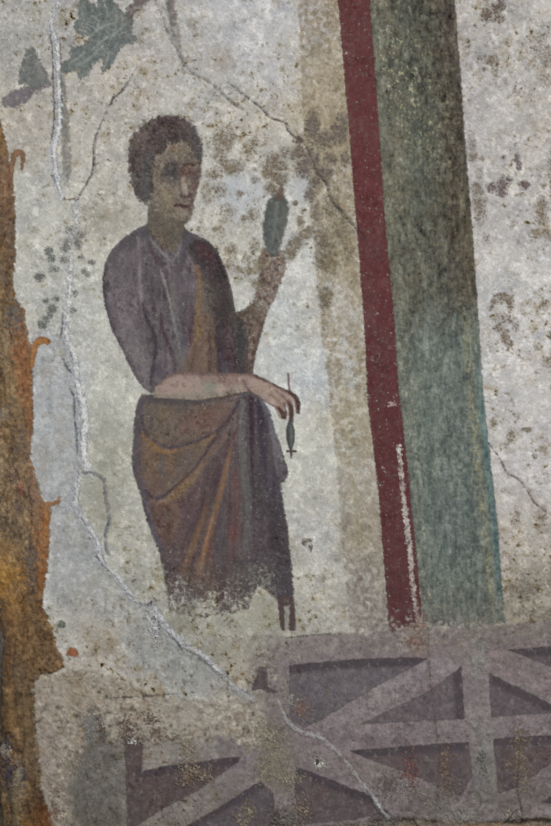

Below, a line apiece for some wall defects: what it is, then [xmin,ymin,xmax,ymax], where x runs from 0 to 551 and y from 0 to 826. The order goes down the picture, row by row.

crack [228,85,309,150]
crack [317,173,365,240]
crack [46,0,245,693]
peeling [396,444,429,647]
flaking render [32,669,331,826]
crack [281,708,336,767]
crack [354,771,386,816]
spalling [337,737,551,826]